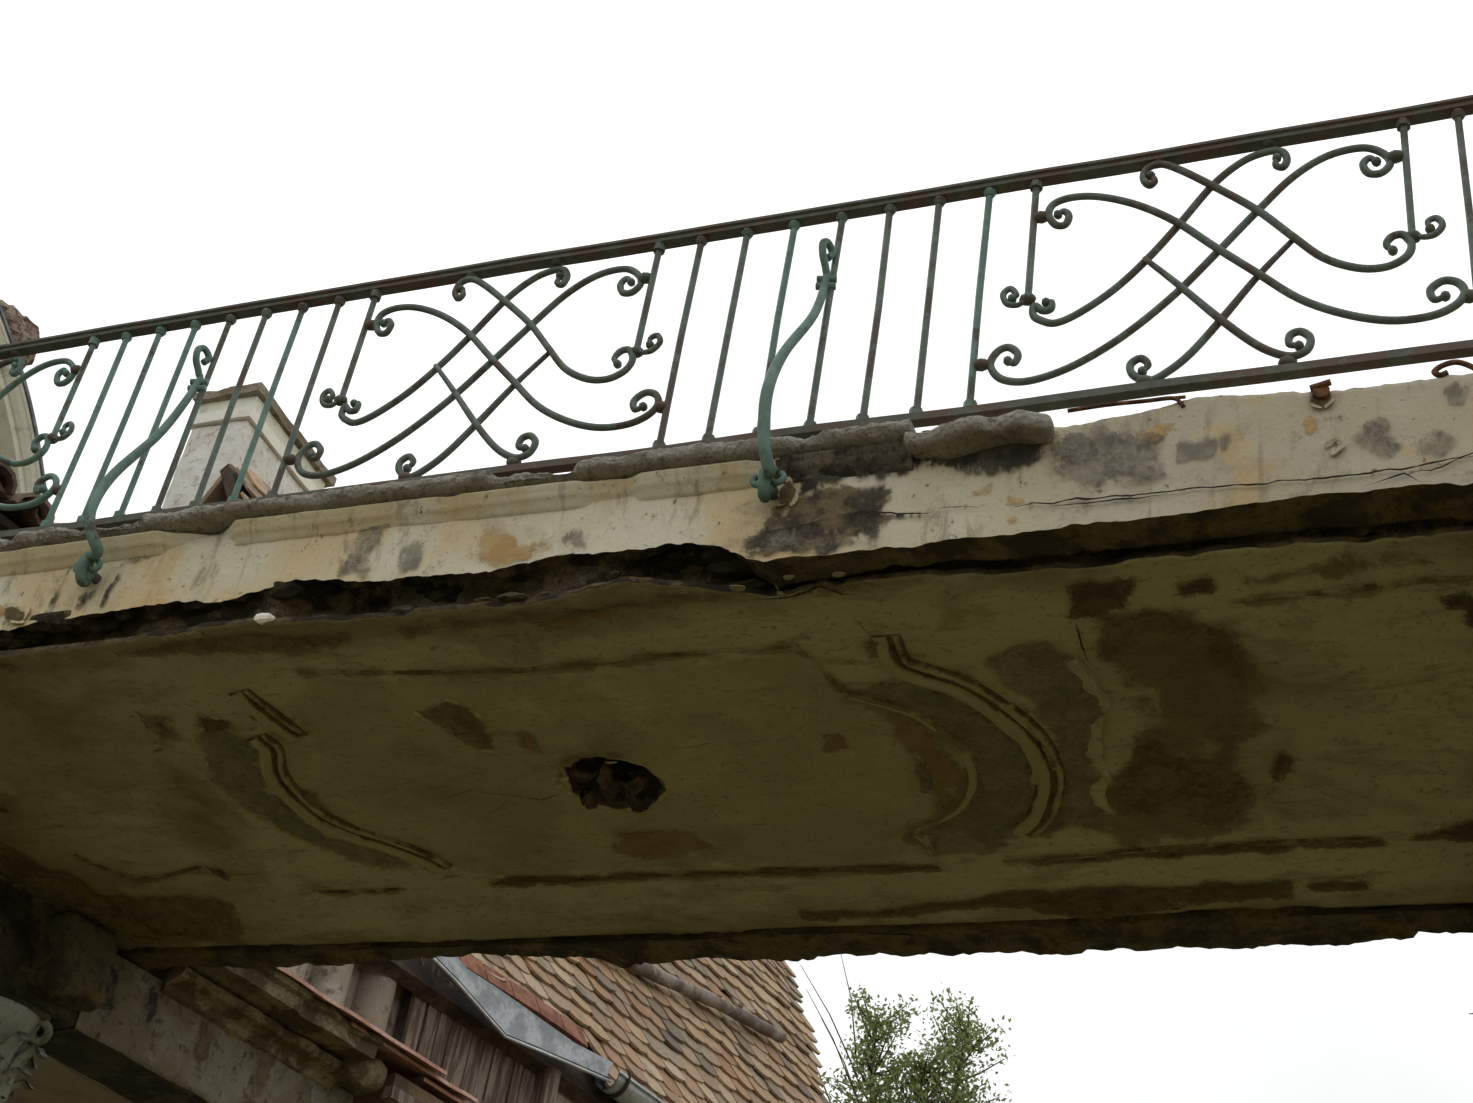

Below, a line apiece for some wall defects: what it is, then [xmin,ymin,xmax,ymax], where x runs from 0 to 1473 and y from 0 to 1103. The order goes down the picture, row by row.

damp [1137,425,1229,462]
crack [754,586,872,637]
crack [1076,624,1090,664]
damp [984,609,1265,848]
spalling [554,751,666,808]
peeling [490,872,659,888]
peeling [798,877,1370,924]